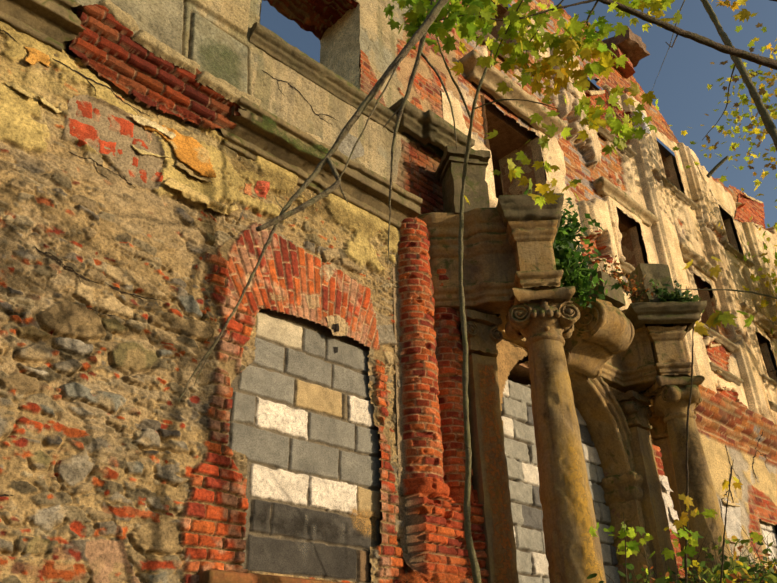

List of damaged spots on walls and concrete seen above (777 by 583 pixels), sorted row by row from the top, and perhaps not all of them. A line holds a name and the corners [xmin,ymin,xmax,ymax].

spalling [3,0,261,215]
crack [262,70,336,124]